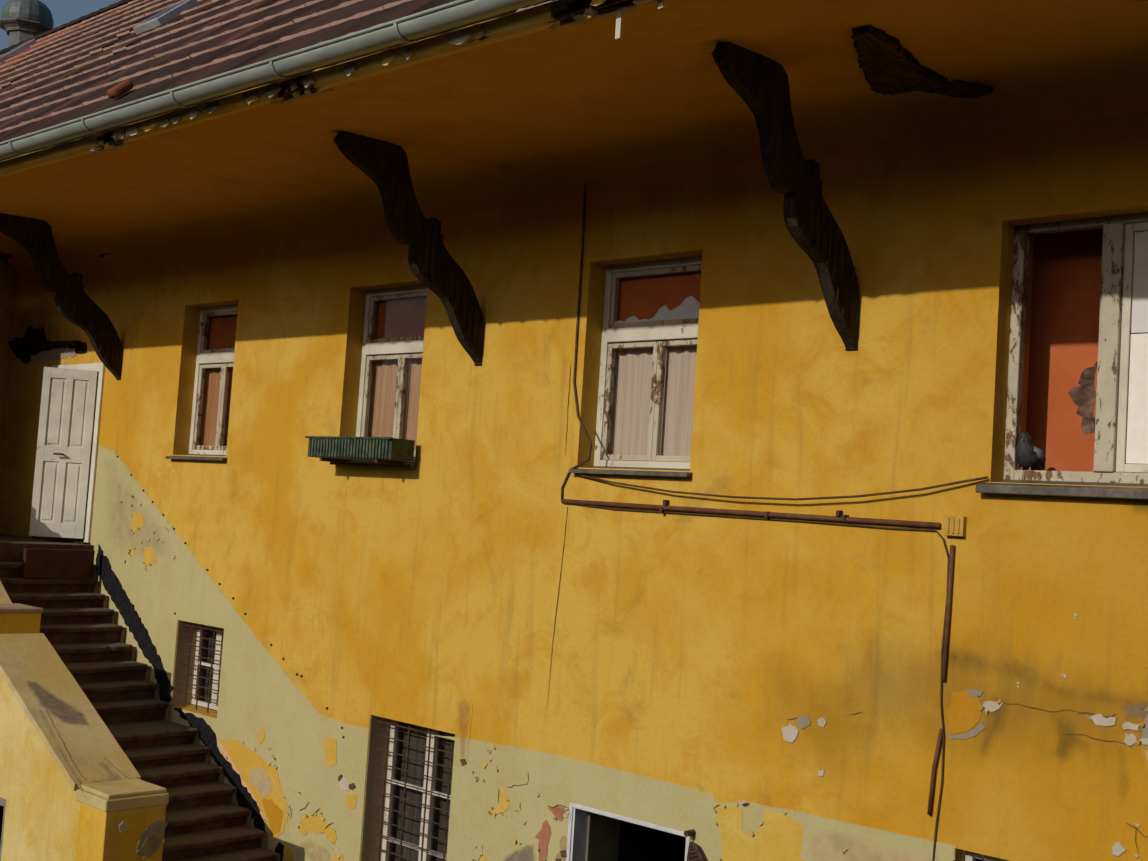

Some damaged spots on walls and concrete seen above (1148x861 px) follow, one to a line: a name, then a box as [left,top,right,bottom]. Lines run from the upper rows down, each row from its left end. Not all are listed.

peeling [119,495,169,571]
flaking render [782,715,827,743]
peeling [947,689,1003,740]
crack [1001,702,1145,748]
flaking render [1083,707,1148,788]
peeling [216,729,344,861]
peeling [471,745,539,825]
flaking render [135,820,168,860]
peeling [535,804,571,861]
peeling [707,799,805,861]